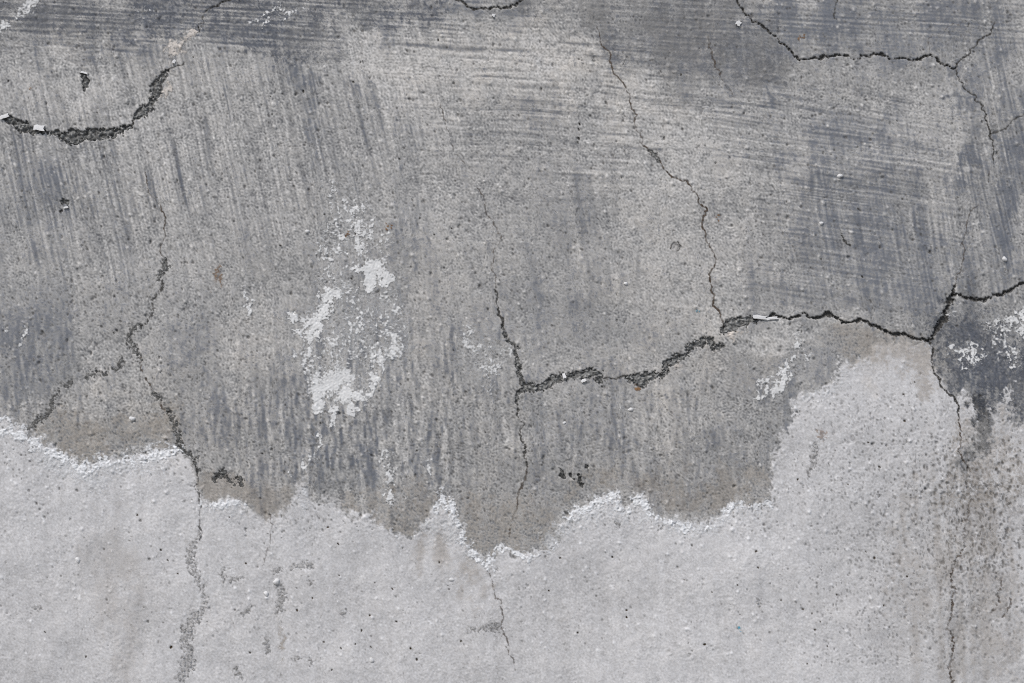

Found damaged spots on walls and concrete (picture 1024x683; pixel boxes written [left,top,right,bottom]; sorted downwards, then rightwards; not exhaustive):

crack [455,0,523,17]
crack [735,0,1024,182]
crack [479,28,1024,537]
crack [27,172,202,540]
water stain [0,416,185,480]
water stain [199,499,247,510]
water stain [425,487,558,572]
water stain [562,491,773,534]
crack [467,596,514,660]
crack [949,546,966,681]